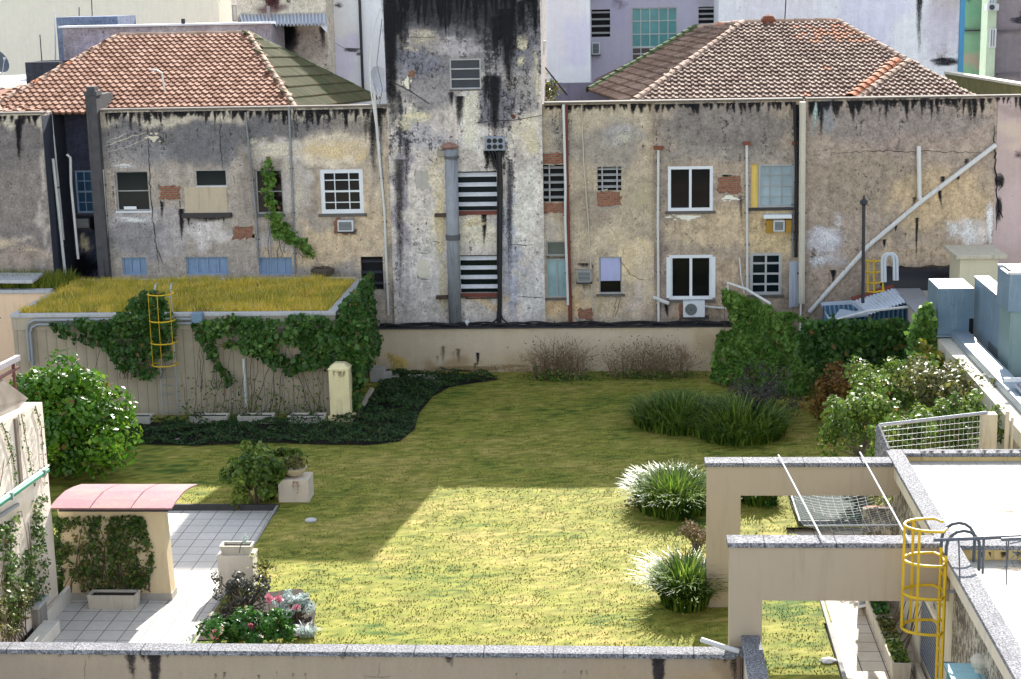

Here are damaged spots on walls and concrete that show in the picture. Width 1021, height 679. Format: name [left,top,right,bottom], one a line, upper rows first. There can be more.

leakage [105,0,538,166]
leakage [0,115,41,153]
leakage [544,97,1021,171]
crack [106,123,163,272]
spalling [158,184,182,202]
spalling [595,189,627,210]
spalling [716,174,742,202]
spalling [230,224,255,242]
leakage [947,221,976,245]
leakage [986,199,1002,244]
leakage [127,655,168,679]
leakage [652,659,665,679]